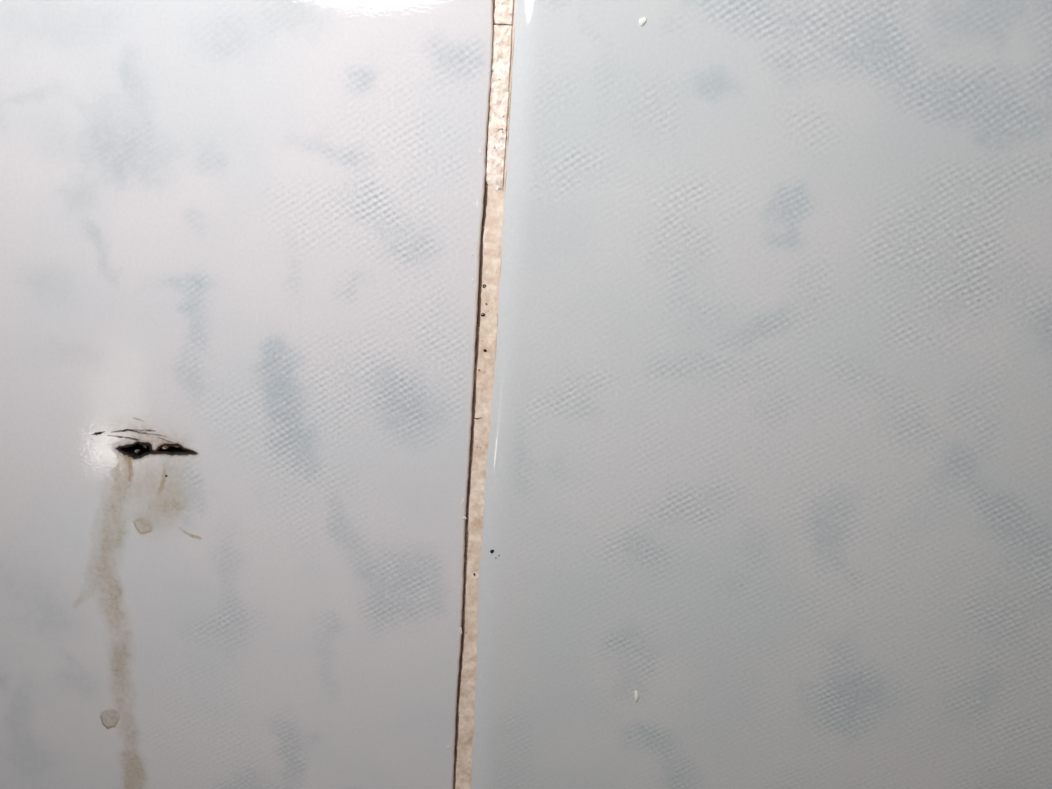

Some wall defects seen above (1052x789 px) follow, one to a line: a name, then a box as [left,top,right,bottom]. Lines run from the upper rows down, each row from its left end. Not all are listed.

spalling [119,443,193,458]